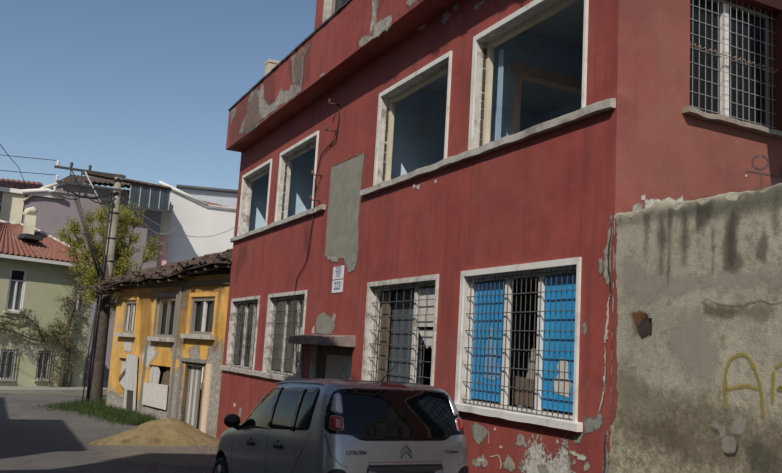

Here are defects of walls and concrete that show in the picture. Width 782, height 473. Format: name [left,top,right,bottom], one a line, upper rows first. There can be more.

peeling [358,0,394,47]
peeling [231,43,311,134]
peeling [311,312,336,334]
crack [598,215,613,413]
spalling [636,313,649,338]
peeling [105,391,124,409]
peeling [141,334,224,435]
peeling [471,413,610,473]